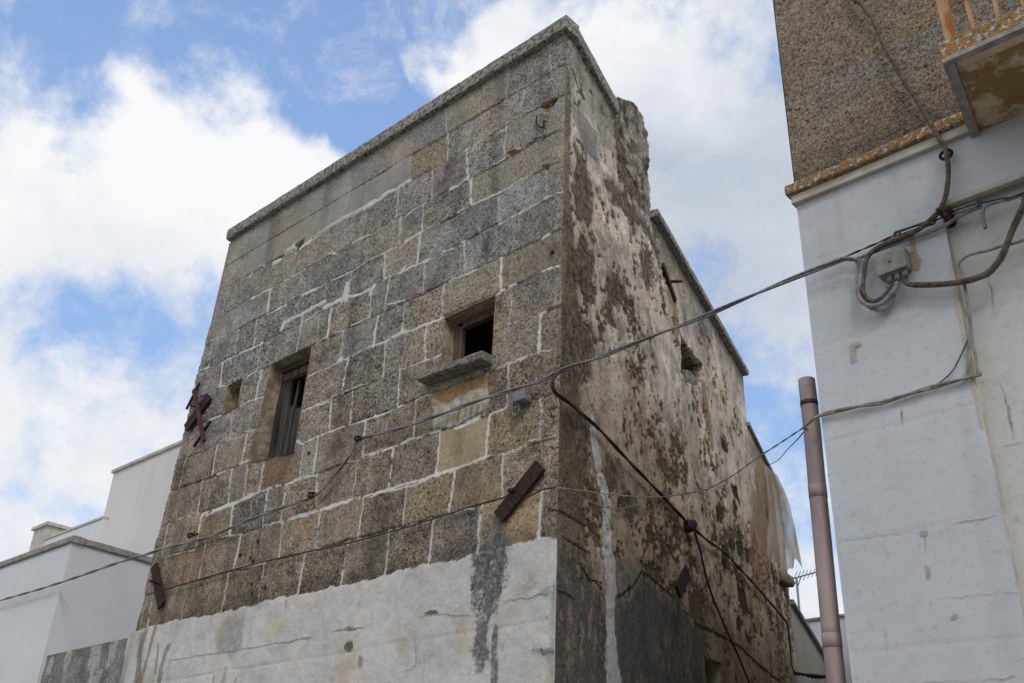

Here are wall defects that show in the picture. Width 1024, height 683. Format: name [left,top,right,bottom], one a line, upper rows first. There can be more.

peeling [562,115,661,478]
spalling [680,344,703,386]
leakage [470,512,510,683]